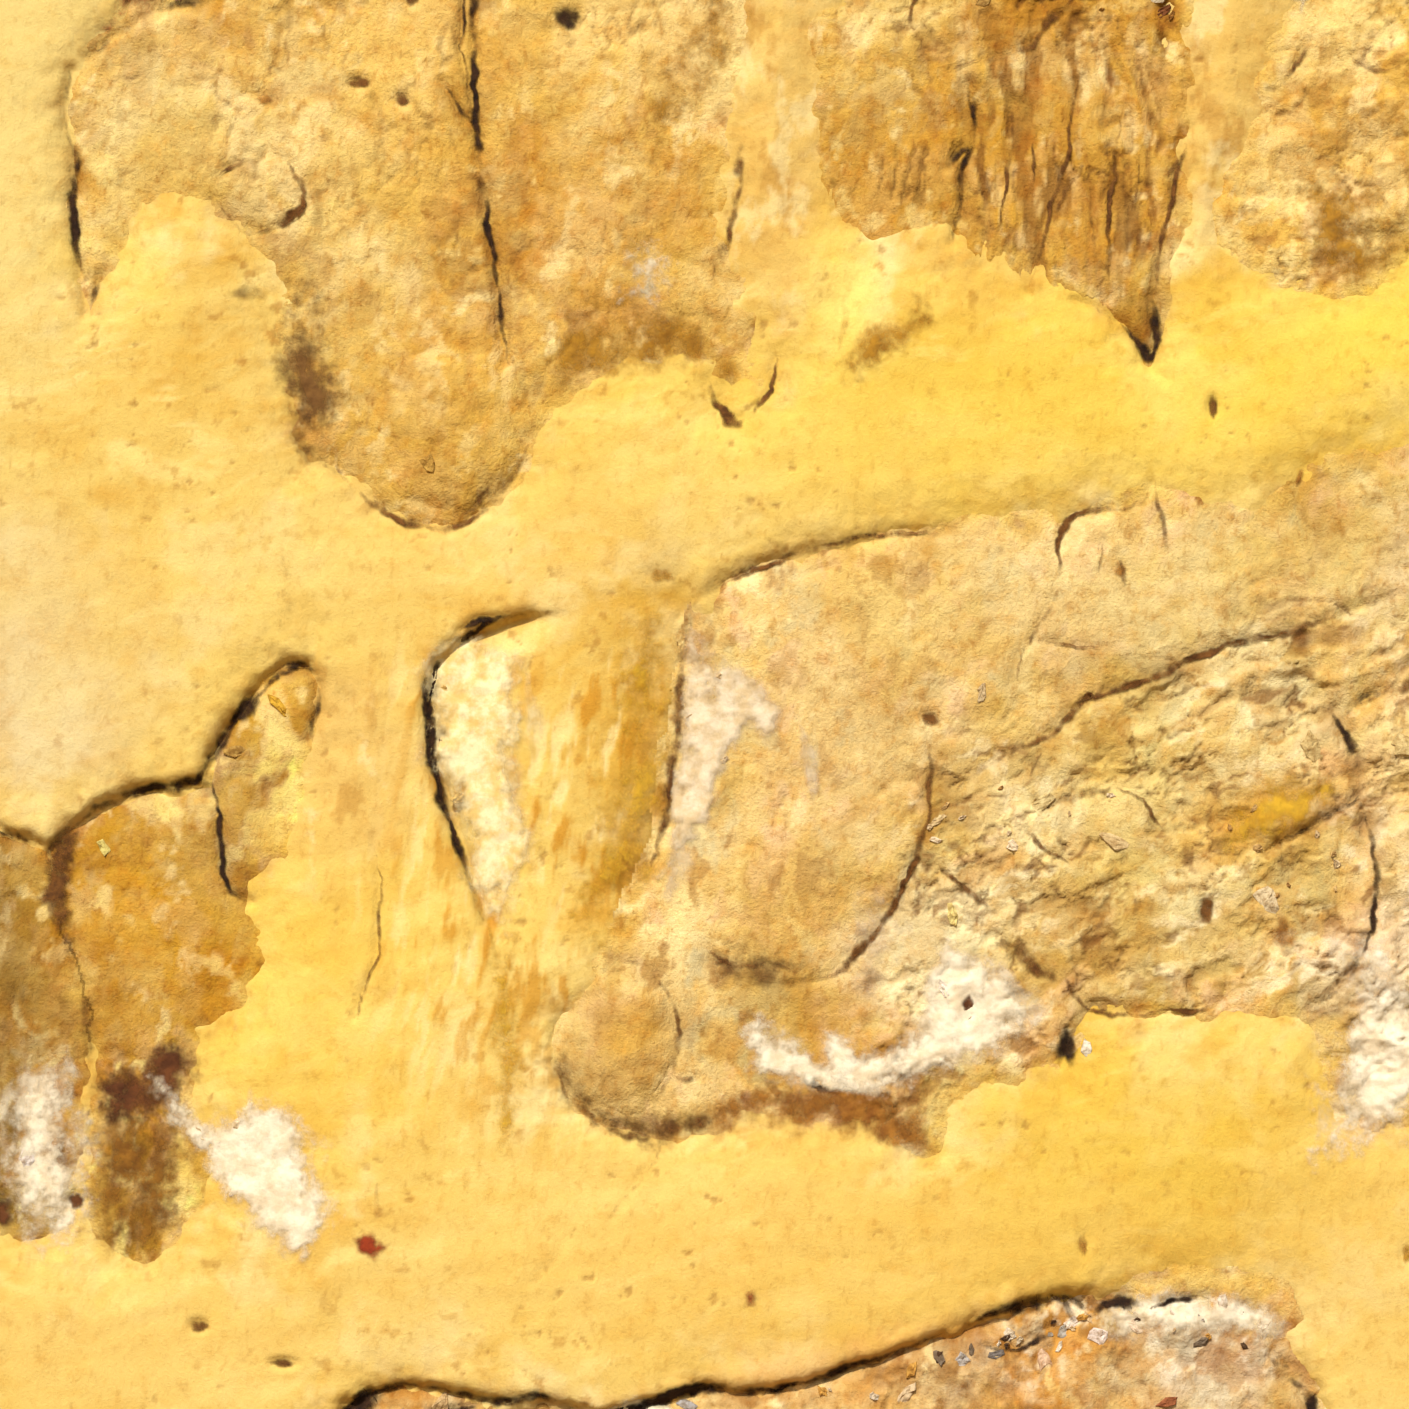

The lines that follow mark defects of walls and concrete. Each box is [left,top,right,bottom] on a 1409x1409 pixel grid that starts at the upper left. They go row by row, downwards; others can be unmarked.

spalling [65,0,764,526]
crack [449,0,505,341]
spalling [807,0,1195,367]
spalling [1209,397,1217,417]
spalling [1212,0,1409,300]
peeling [423,637,540,912]
spalling [551,443,1409,1159]
water stain [5,1069,88,1233]
spalling [0,663,326,1264]
water stain [743,943,1041,1091]
spalling [369,1385,493,1409]
spalling [664,1264,1326,1409]